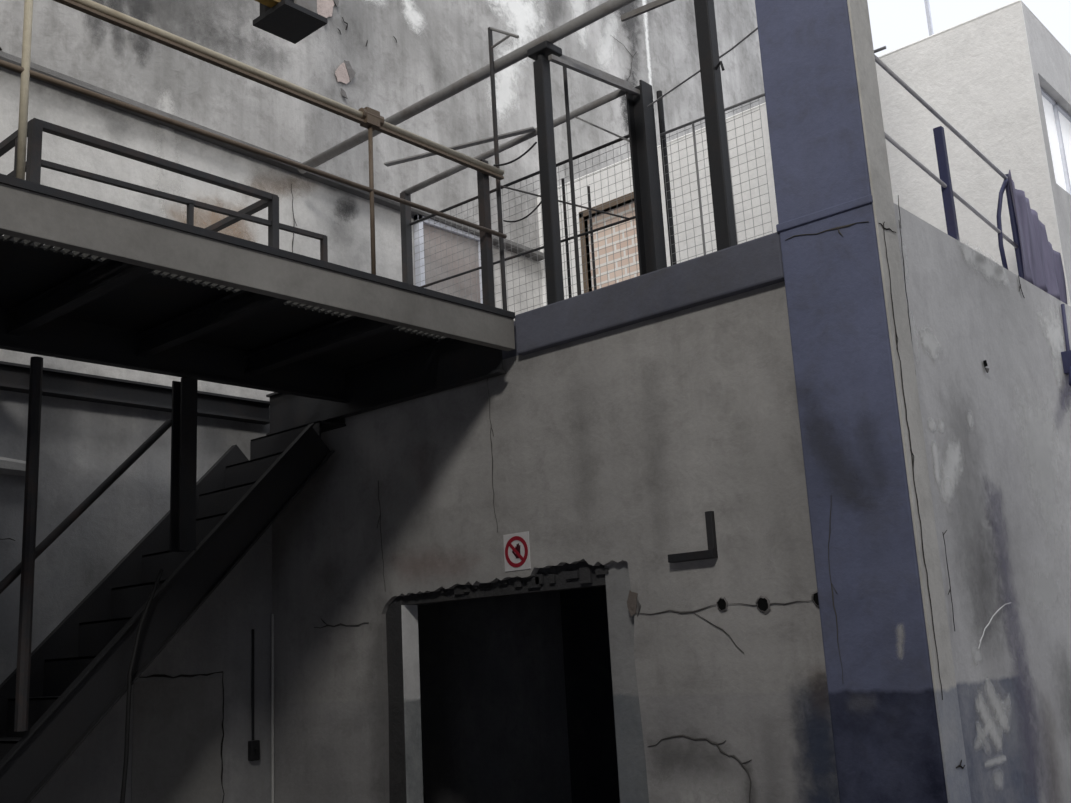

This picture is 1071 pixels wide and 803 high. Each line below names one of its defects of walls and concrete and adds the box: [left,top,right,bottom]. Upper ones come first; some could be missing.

water stain [93,0,150,22]
spalling [317,0,339,26]
spalling [335,60,355,99]
water stain [619,0,653,91]
peeling [928,420,962,503]
crack [639,509,843,679]
peeling [976,680,1008,766]
crack [647,735,751,803]